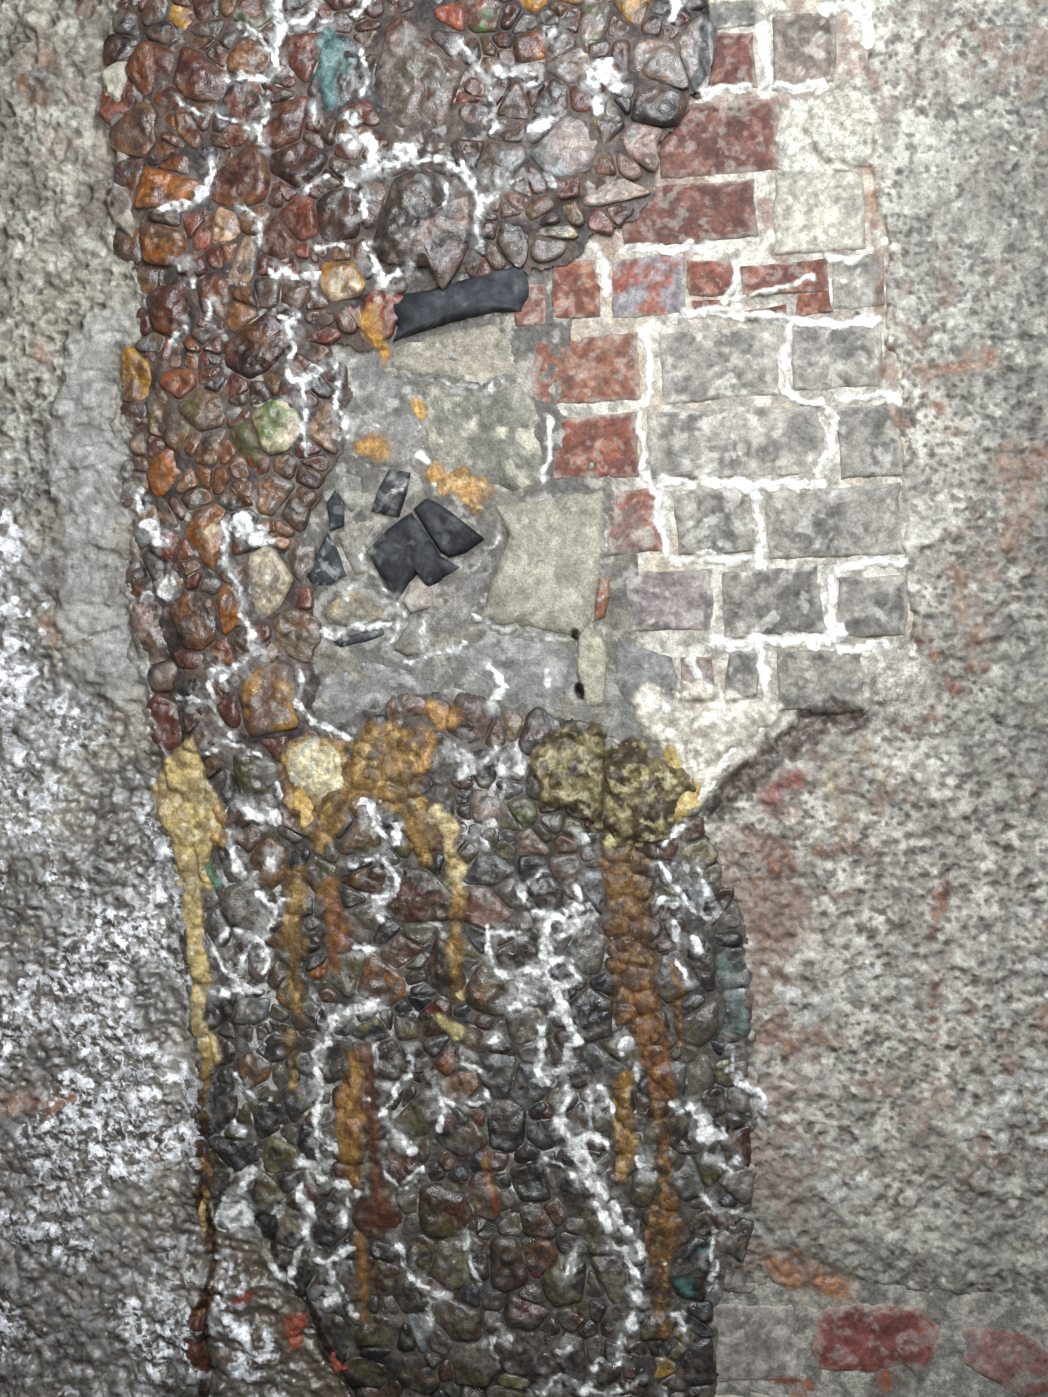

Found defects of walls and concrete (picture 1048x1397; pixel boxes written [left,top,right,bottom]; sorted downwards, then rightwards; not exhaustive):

spalling [96,0,909,806]
water stain [636,259,903,571]
spalling [179,917,199,1054]
water stain [117,1239,274,1397]
crack [183,1089,217,1397]
water stain [0,510,526,1326]
corrosion [282,866,349,1090]
corrosion [334,1044,394,1322]
corrosion [436,1014,465,1040]
water stain [485,870,646,1397]
spalling [189,564,1048,1397]
corrosion [599,831,686,1340]